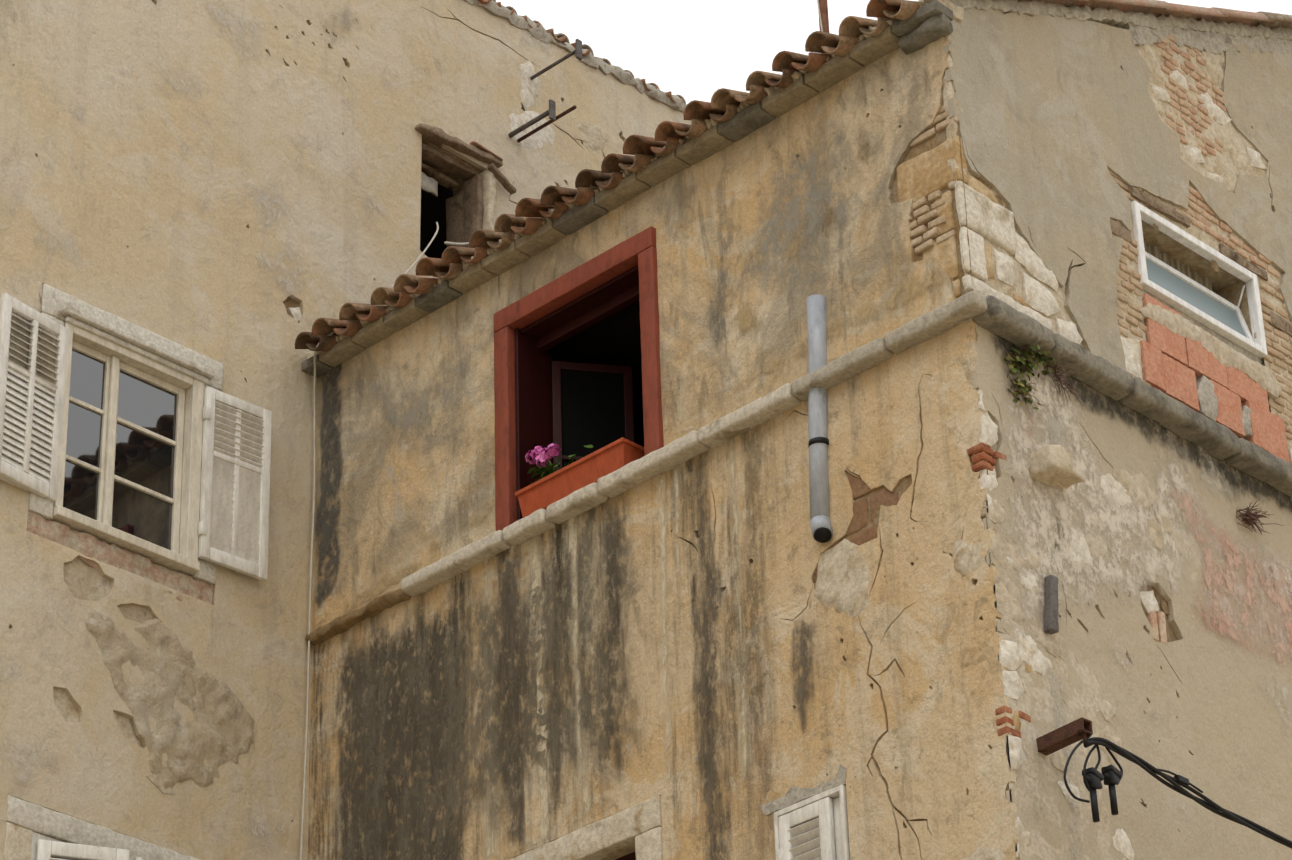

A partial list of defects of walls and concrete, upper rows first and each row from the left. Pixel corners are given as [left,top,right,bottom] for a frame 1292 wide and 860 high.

spalling [891,34,1084,348]
spalling [1108,34,1292,464]
spalling [63,557,154,624]
leakage [316,364,341,606]
leakage [337,502,631,860]
leakage [657,465,679,780]
leakage [693,438,741,860]
leakage [739,674,747,775]
leakage [792,621,814,729]
spalling [826,470,912,552]
crack [875,760,927,827]
peeling [967,347,1292,860]